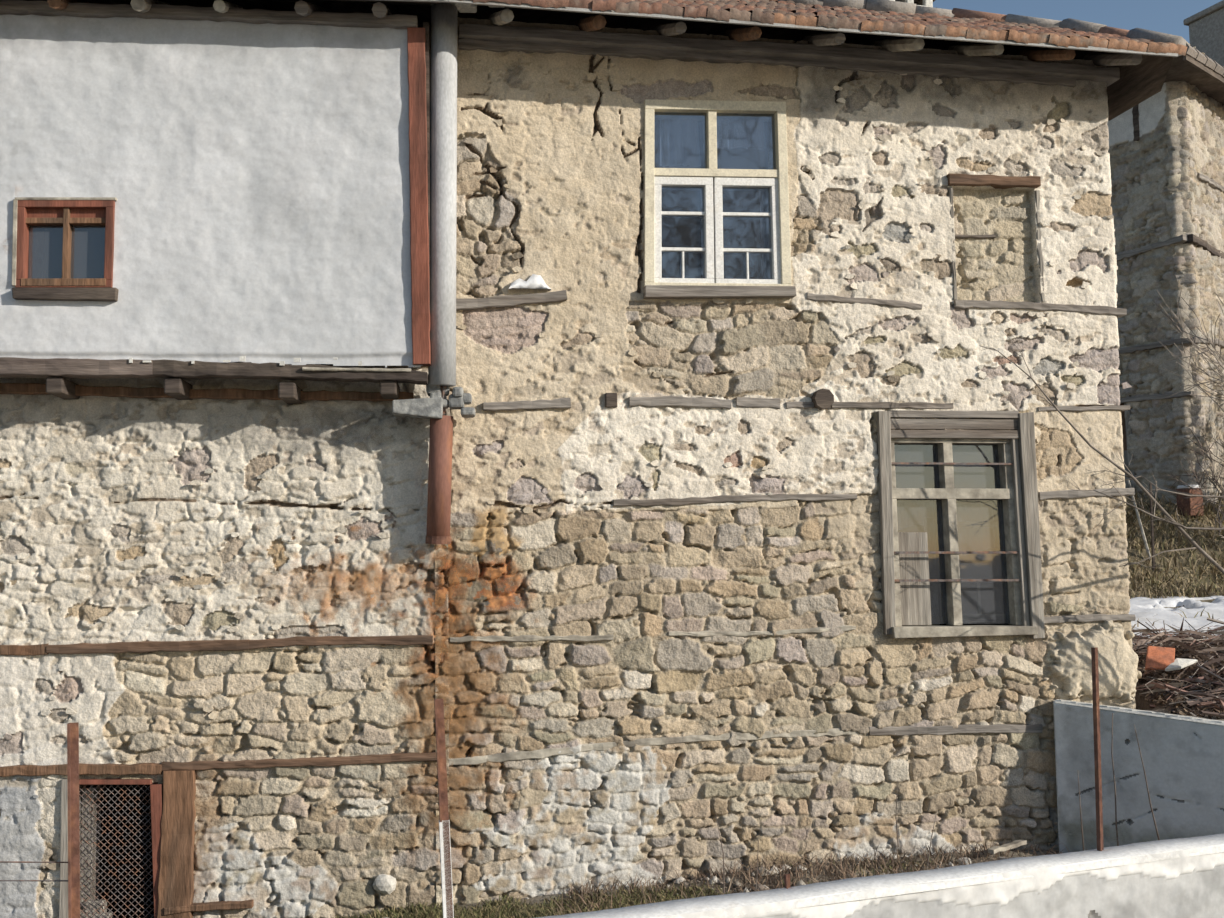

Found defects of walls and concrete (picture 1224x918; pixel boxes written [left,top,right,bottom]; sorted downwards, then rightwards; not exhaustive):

crack [587,54,644,294]
spalling [456,129,549,354]
spalling [560,331,602,350]
spalling [625,298,1132,412]
spalling [167,445,216,485]
crack [114,498,413,514]
spalling [472,440,554,509]
spalling [1034,422,1085,481]
rust [419,509,521,642]
spalling [33,667,88,746]
crack [1075,774,1185,825]